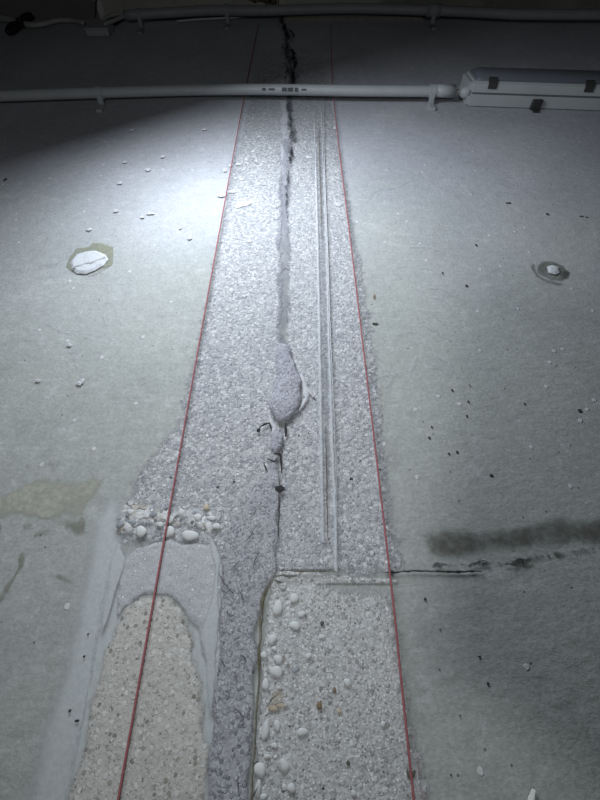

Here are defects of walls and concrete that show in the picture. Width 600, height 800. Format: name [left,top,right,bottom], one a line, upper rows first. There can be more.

spalling [116,95,428,800]
crack [385,558,532,576]